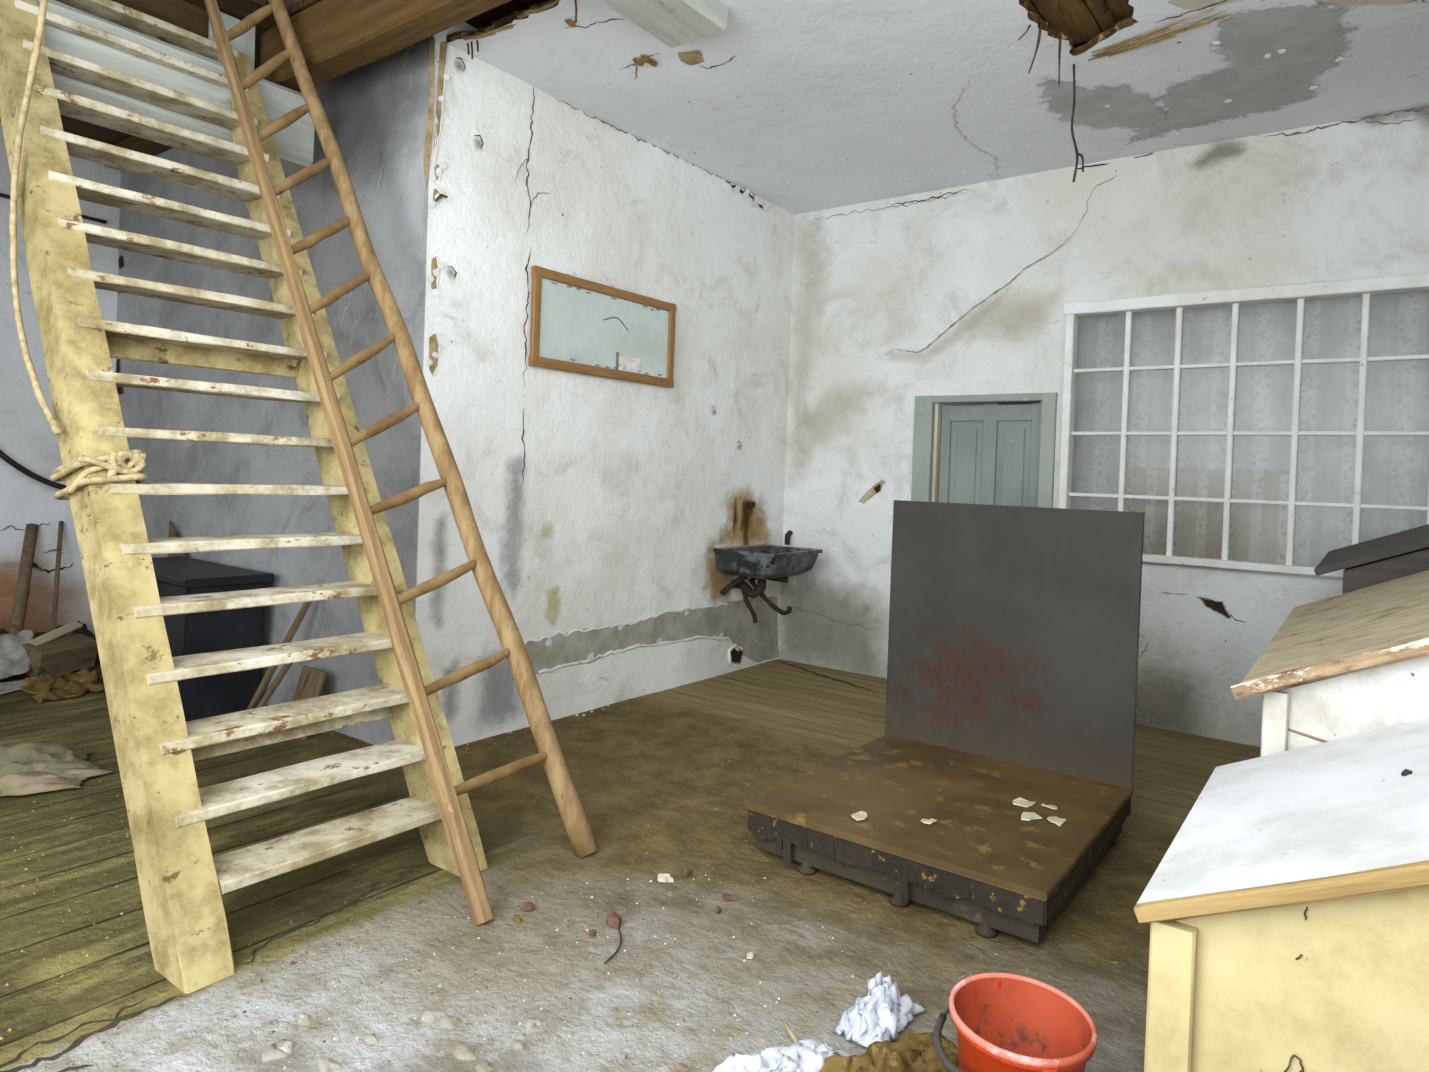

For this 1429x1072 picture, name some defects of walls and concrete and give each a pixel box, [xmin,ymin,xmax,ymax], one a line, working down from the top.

peeling [1018,0,1416,143]
crack [516,87,770,485]
rust [720,493,767,545]
rust [708,558,731,599]
spalling [524,597,779,674]